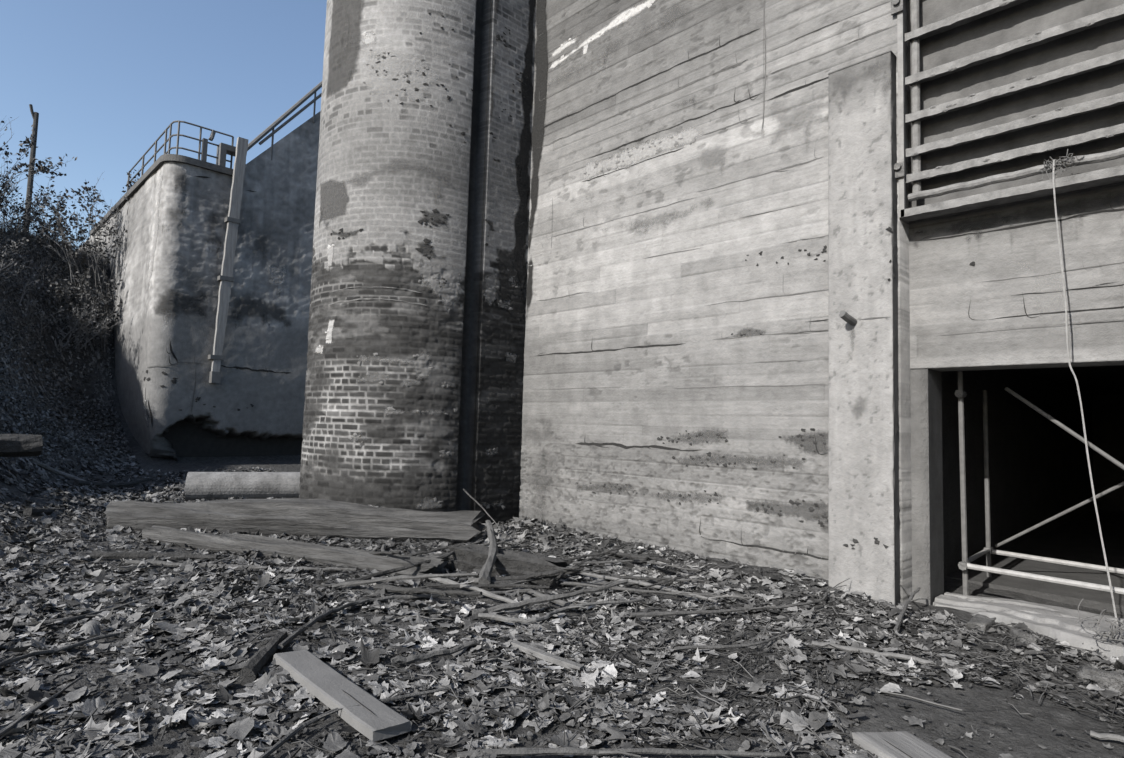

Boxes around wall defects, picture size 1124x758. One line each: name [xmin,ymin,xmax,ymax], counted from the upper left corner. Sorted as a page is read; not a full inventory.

spalling [327,228,363,266]
peeling [415,209,461,312]
crack [538,290,590,301]
peeling [315,320,334,354]
crack [538,337,686,356]
crack [679,289,829,389]
crack [575,439,698,451]